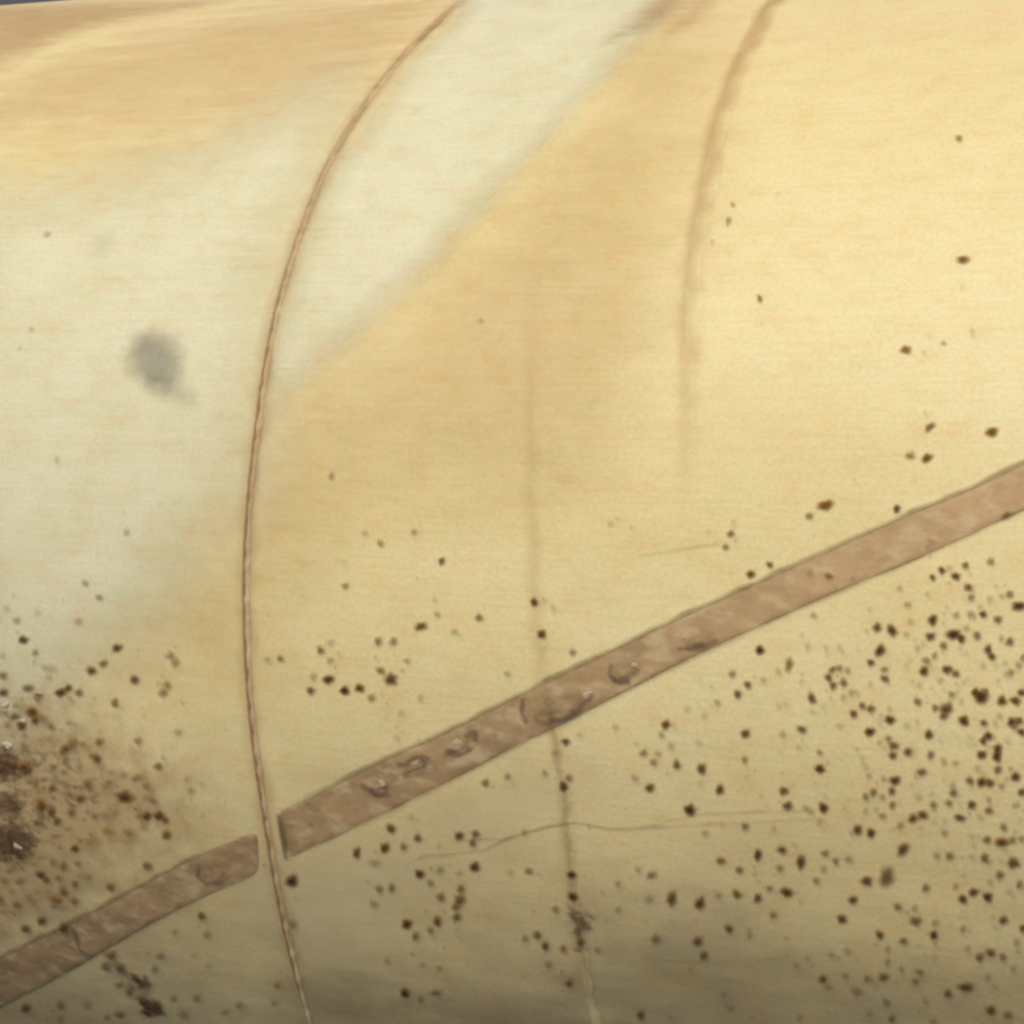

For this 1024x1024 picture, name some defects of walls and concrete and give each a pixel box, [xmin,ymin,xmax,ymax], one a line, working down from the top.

corrosion [929,562,973,599]
corrosion [873,623,896,635]
corrosion [926,615,995,659]
corrosion [867,644,887,681]
corrosion [307,675,363,694]
corrosion [378,668,396,684]
corrosion [971,688,1024,704]
corrosion [933,704,968,725]
corrosion [1008,717,1024,735]
corrosion [966,720,1024,795]
corrosion [117,790,170,838]
corrosion [958,888,992,903]